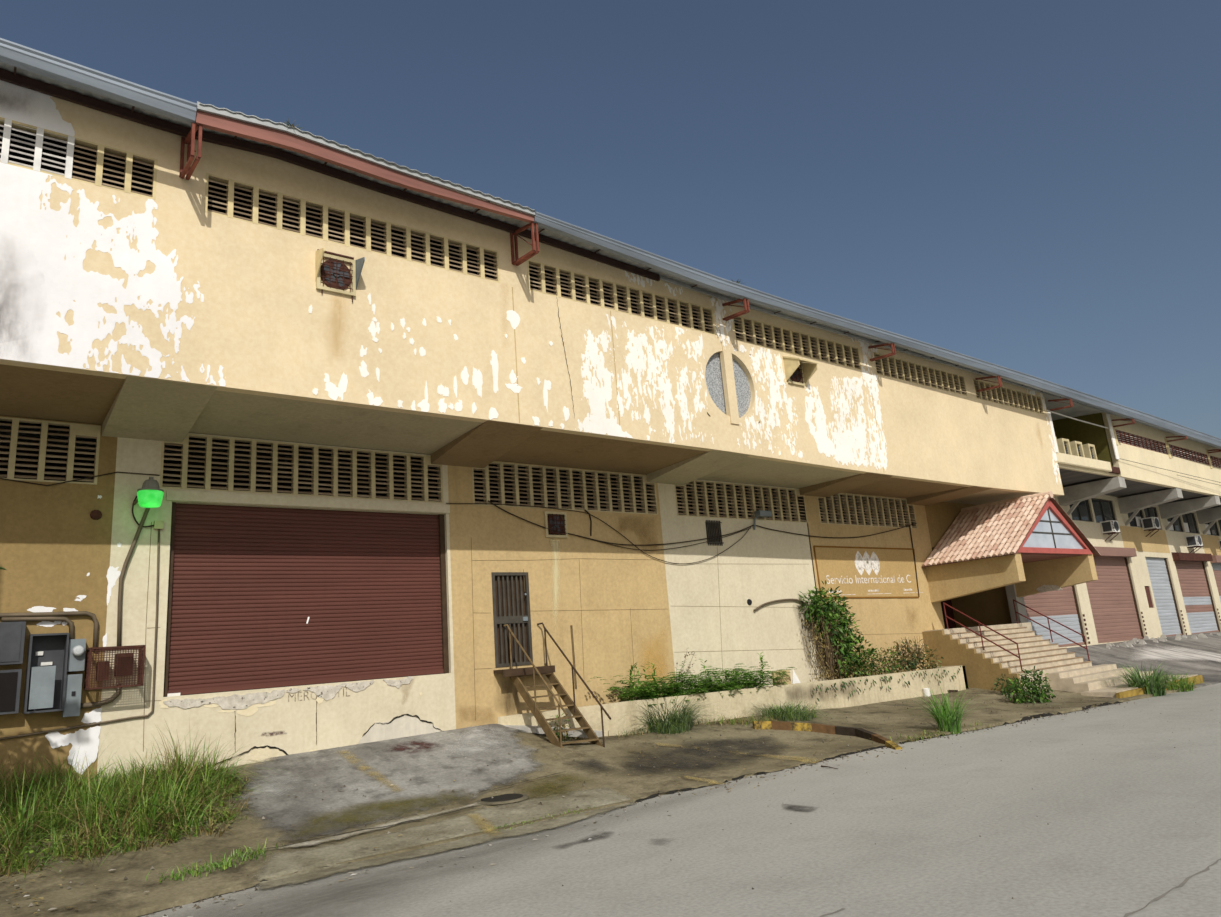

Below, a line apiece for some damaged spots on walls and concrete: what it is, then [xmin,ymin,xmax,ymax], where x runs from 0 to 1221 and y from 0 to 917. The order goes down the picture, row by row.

peeling [0,80,75,136]
peeling [0,162,226,386]
peeling [312,293,458,406]
peeling [505,310,520,338]
peeling [397,350,526,420]
peeling [532,297,887,471]
peeling [45,708,102,775]
crack [207,715,317,768]
spalling [159,676,423,717]
crack [363,714,442,735]